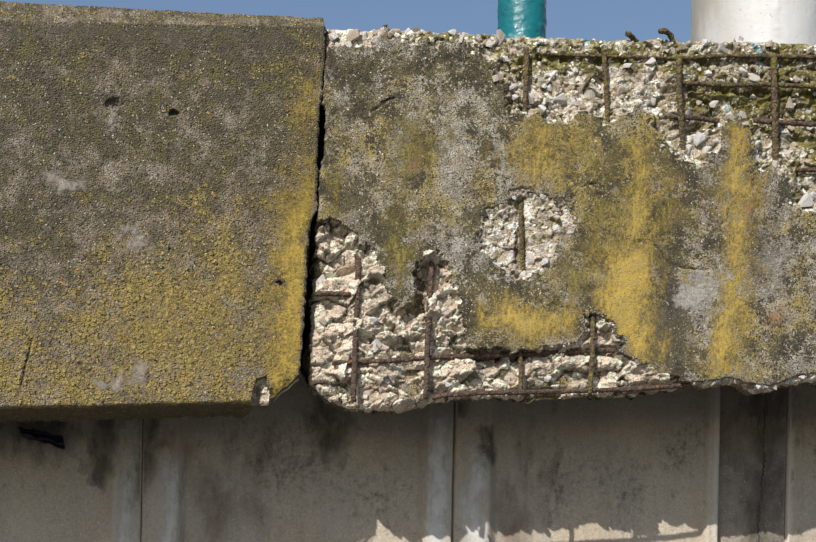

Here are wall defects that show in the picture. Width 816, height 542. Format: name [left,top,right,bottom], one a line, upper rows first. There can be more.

spalling [325,27,816,219]
spalling [478,188,577,281]
spalling [308,220,816,414]
spalling [250,378,299,406]
leakage [163,467,178,542]